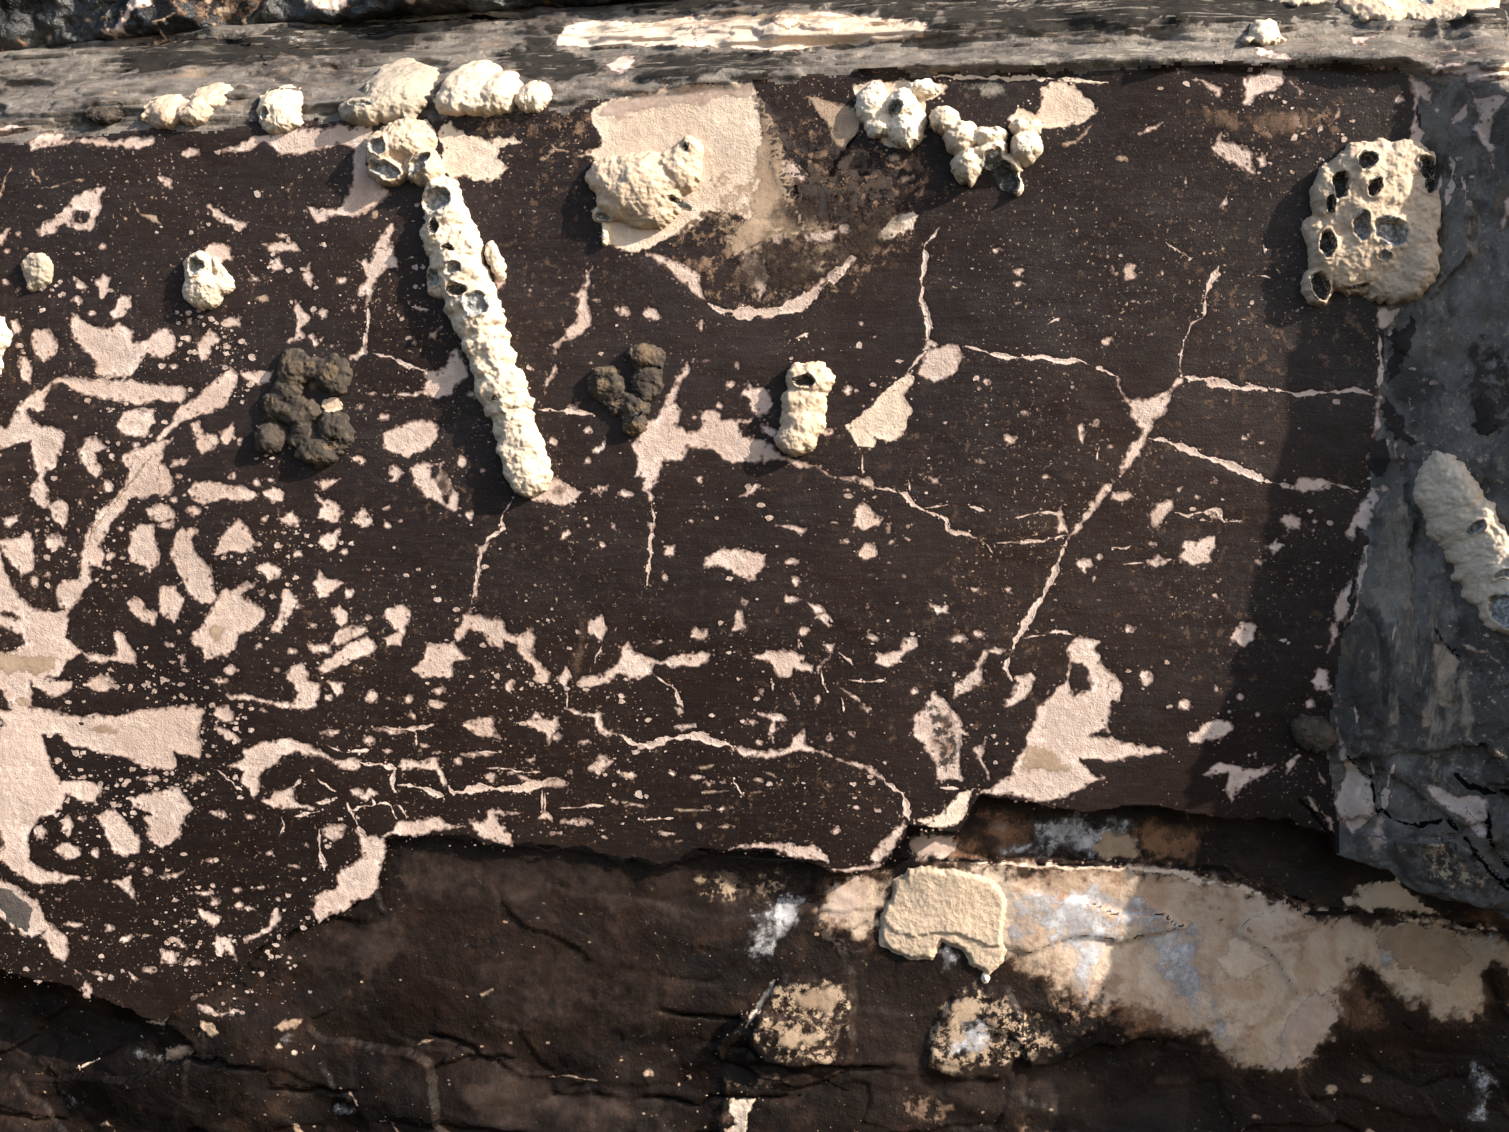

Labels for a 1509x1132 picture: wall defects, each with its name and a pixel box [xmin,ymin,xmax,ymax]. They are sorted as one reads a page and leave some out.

peeling [303,0,351,21]
peeling [555,7,948,257]
peeling [1001,72,1105,148]
peeling [1156,45,1355,189]
crack [815,227,1376,682]
crack [456,496,528,614]
peeling [0,119,1415,1083]
crack [561,703,912,821]
crack [896,857,1119,868]
water stain [1008,883,1228,1038]
water stain [724,1074,786,1089]
water stain [903,1089,954,1122]